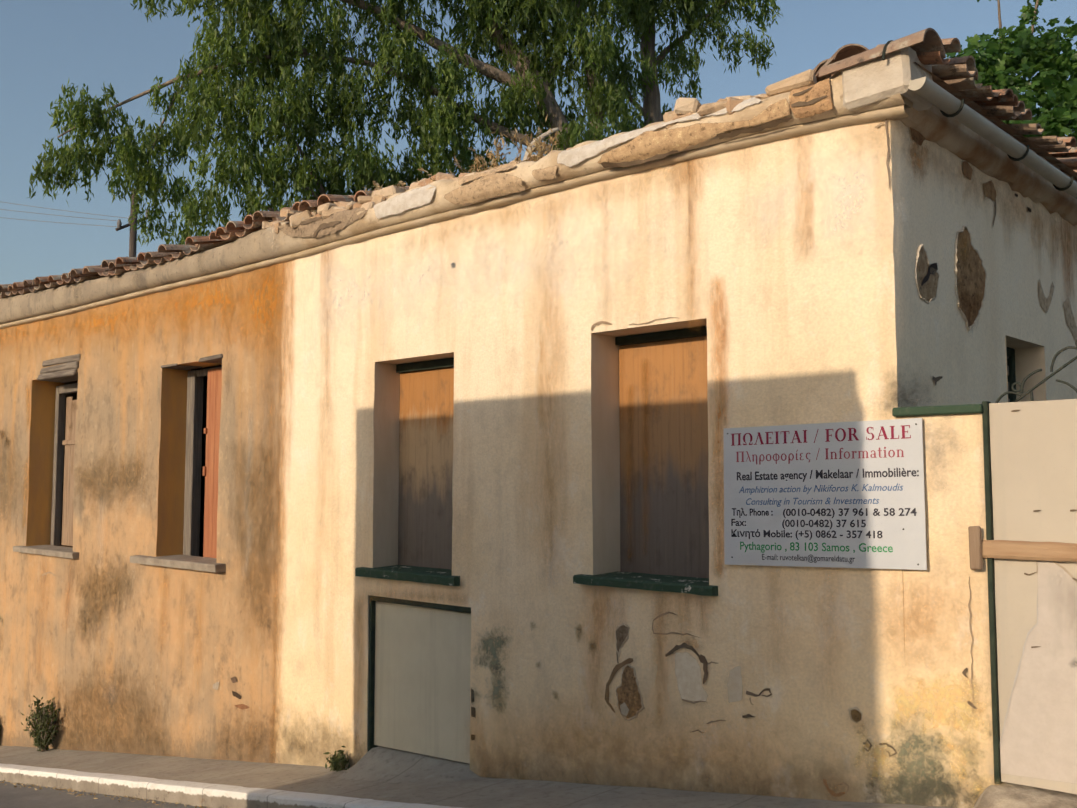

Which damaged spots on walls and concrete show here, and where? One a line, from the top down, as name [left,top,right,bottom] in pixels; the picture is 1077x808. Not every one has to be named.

flaking render [983,181,997,225]
flaking render [914,244,940,304]
flaking render [954,225,987,331]
peeling [1038,280,1077,340]
flaking render [605,623,645,721]
peeling [665,642,718,704]